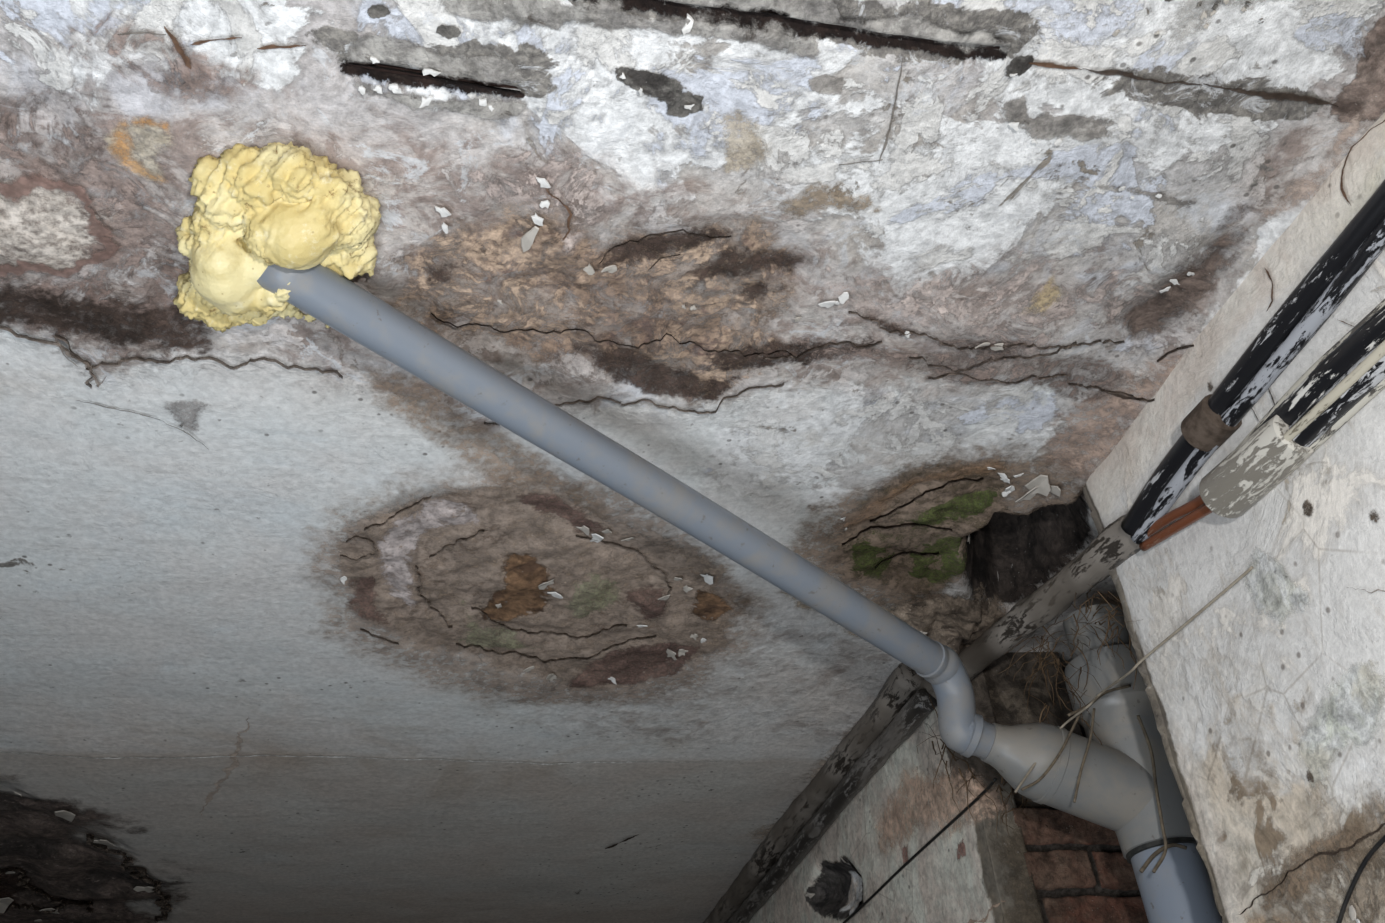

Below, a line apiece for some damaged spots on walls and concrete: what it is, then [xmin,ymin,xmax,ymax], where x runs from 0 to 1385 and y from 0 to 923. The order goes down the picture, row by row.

crack [0,325,343,389]
crack [554,292,1147,414]
spalling [313,475,755,704]
spalling [793,448,1093,655]
spalling [0,792,187,923]
leakage [1248,796,1385,923]